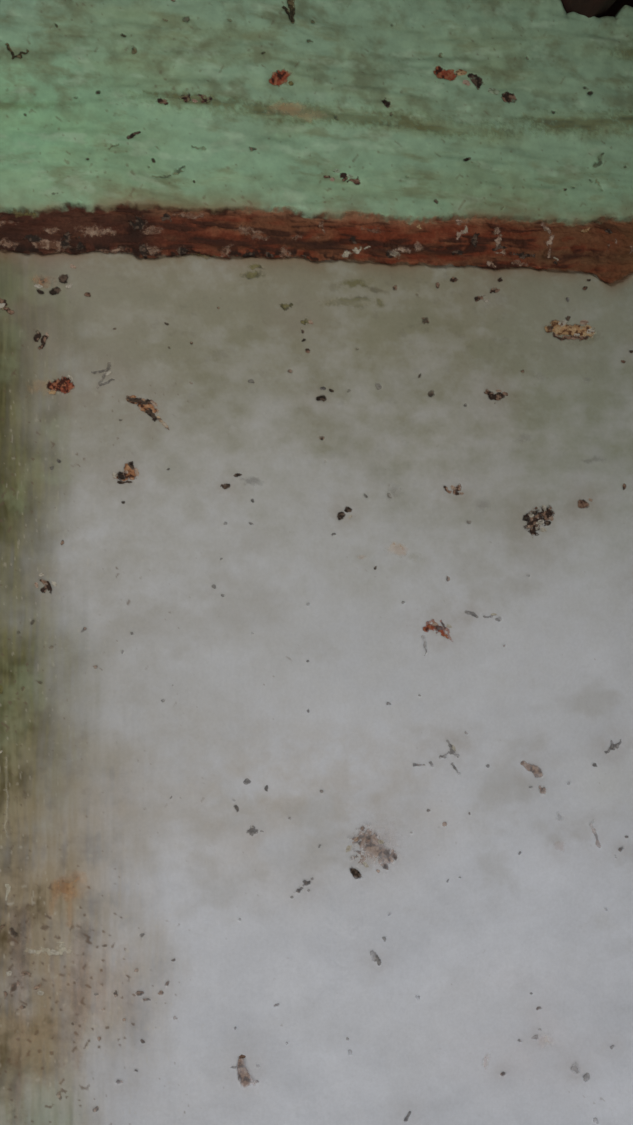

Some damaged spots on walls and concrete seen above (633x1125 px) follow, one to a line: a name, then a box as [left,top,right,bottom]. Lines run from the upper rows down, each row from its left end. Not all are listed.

spalling [544,316,594,341]